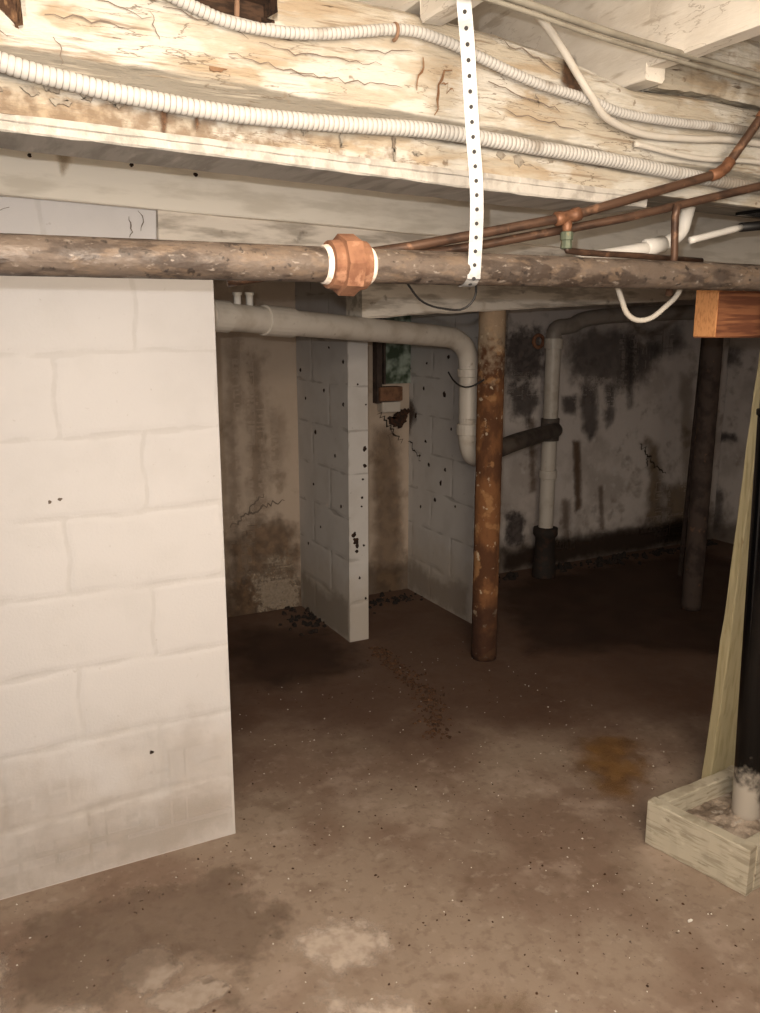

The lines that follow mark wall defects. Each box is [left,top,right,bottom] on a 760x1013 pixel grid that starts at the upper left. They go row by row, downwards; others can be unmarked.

crack [45,0,213,65]
crack [229,31,454,115]
damp [505,328,545,423]
damp [563,331,659,438]
damp [230,520,300,617]
damp [504,511,535,570]